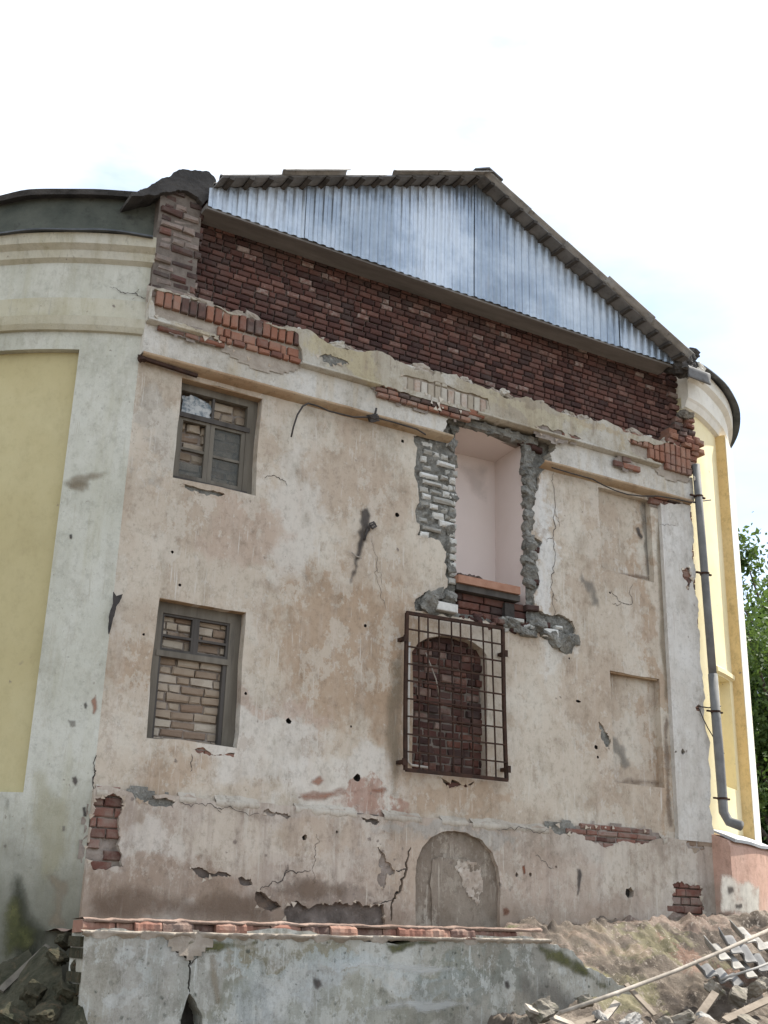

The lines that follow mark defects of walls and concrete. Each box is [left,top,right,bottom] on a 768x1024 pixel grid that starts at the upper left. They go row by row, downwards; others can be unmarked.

flaking render [146,285,301,374]
spalling [315,354,348,367]
flaking render [613,416,705,483]
spalling [371,371,581,659]
crack [548,479,560,616]
flaking render [77,785,175,870]
crack [260,834,318,890]
flaking render [544,820,659,847]
spalling [190,867,386,925]
flaking render [667,881,707,917]